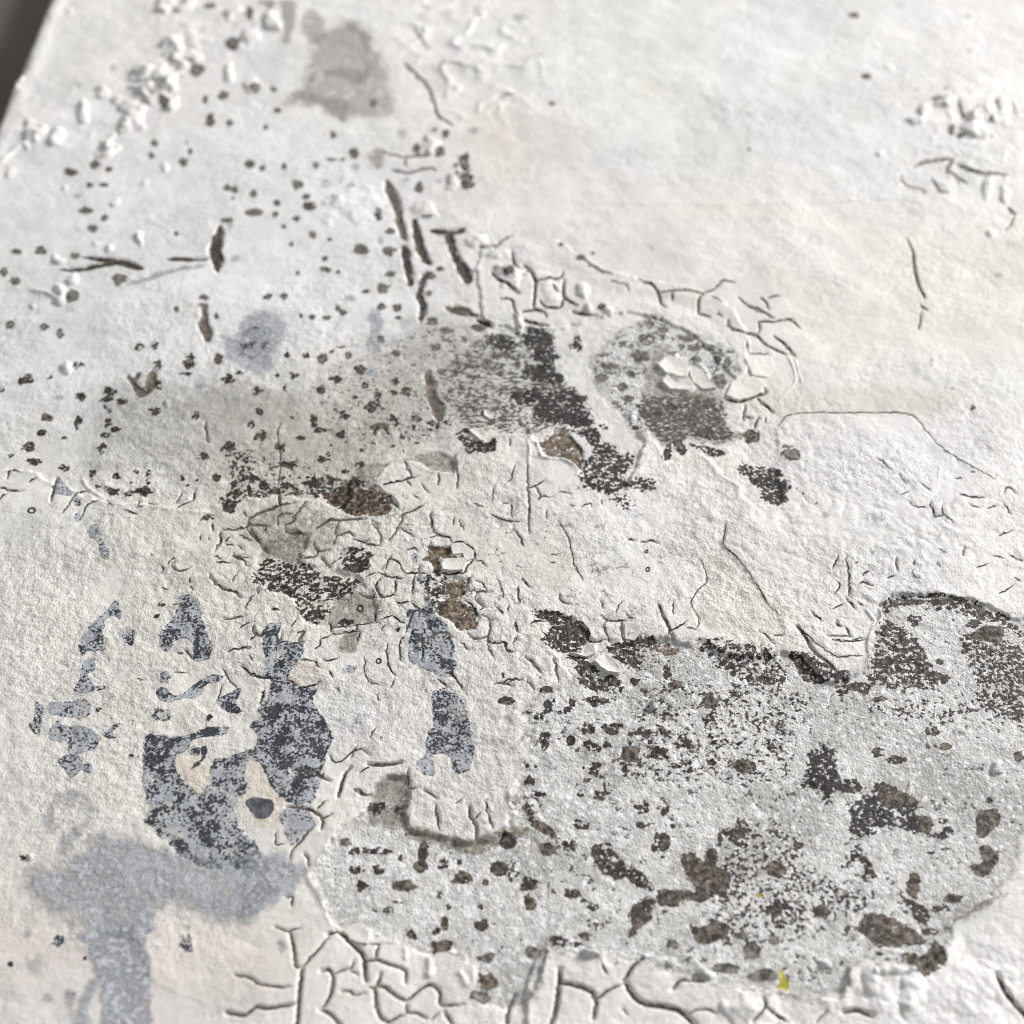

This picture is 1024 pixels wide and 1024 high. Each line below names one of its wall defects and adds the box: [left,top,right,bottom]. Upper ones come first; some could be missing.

spalling [425,368,446,421]
spalling [461,359,493,370]
peeling [468,428,488,442]
crack [478,236,591,327]
flaking render [589,313,774,447]
crack [586,261,799,357]
crack [0,422,603,703]
crack [723,389,1023,672]
leakage [24,594,334,1024]
flaking render [312,589,1024,1008]
crack [226,896,461,1024]
crack [550,958,714,1024]